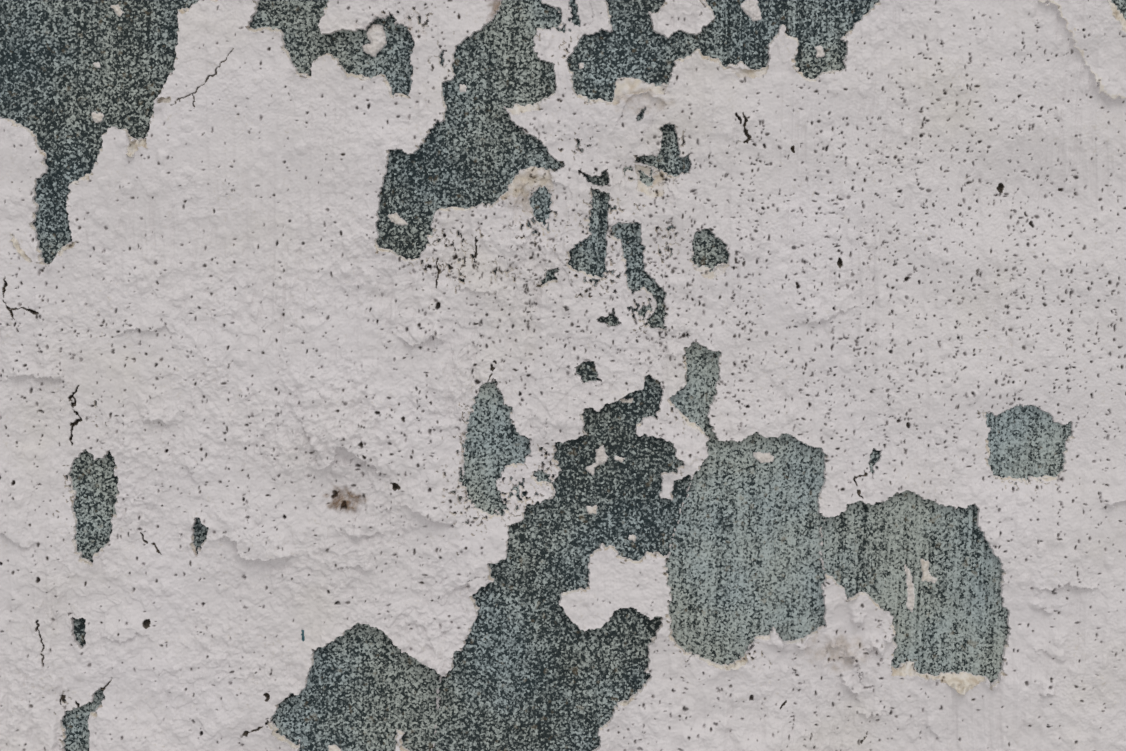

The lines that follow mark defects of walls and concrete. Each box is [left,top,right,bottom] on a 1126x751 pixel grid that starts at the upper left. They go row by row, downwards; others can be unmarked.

peeling [245,0,434,99]
peeling [1039,0,1126,100]
peeling [0,0,218,266]
peeling [374,0,882,333]
peeling [982,404,1076,490]
peeling [63,449,120,567]
peeling [263,341,1011,751]
peeling [59,689,105,751]